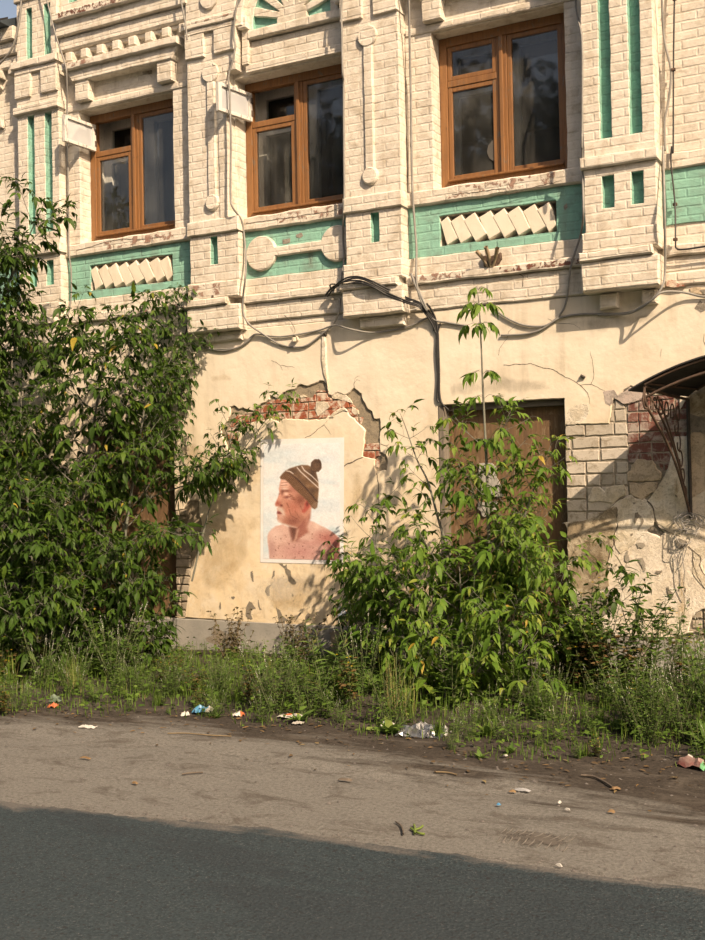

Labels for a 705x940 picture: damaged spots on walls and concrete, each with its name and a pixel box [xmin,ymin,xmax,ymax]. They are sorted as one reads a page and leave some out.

crack [498,327,602,403]
spalling [222,381,388,473]
spalling [565,386,705,616]
spalling [236,564,301,638]
spalling [668,588,705,640]